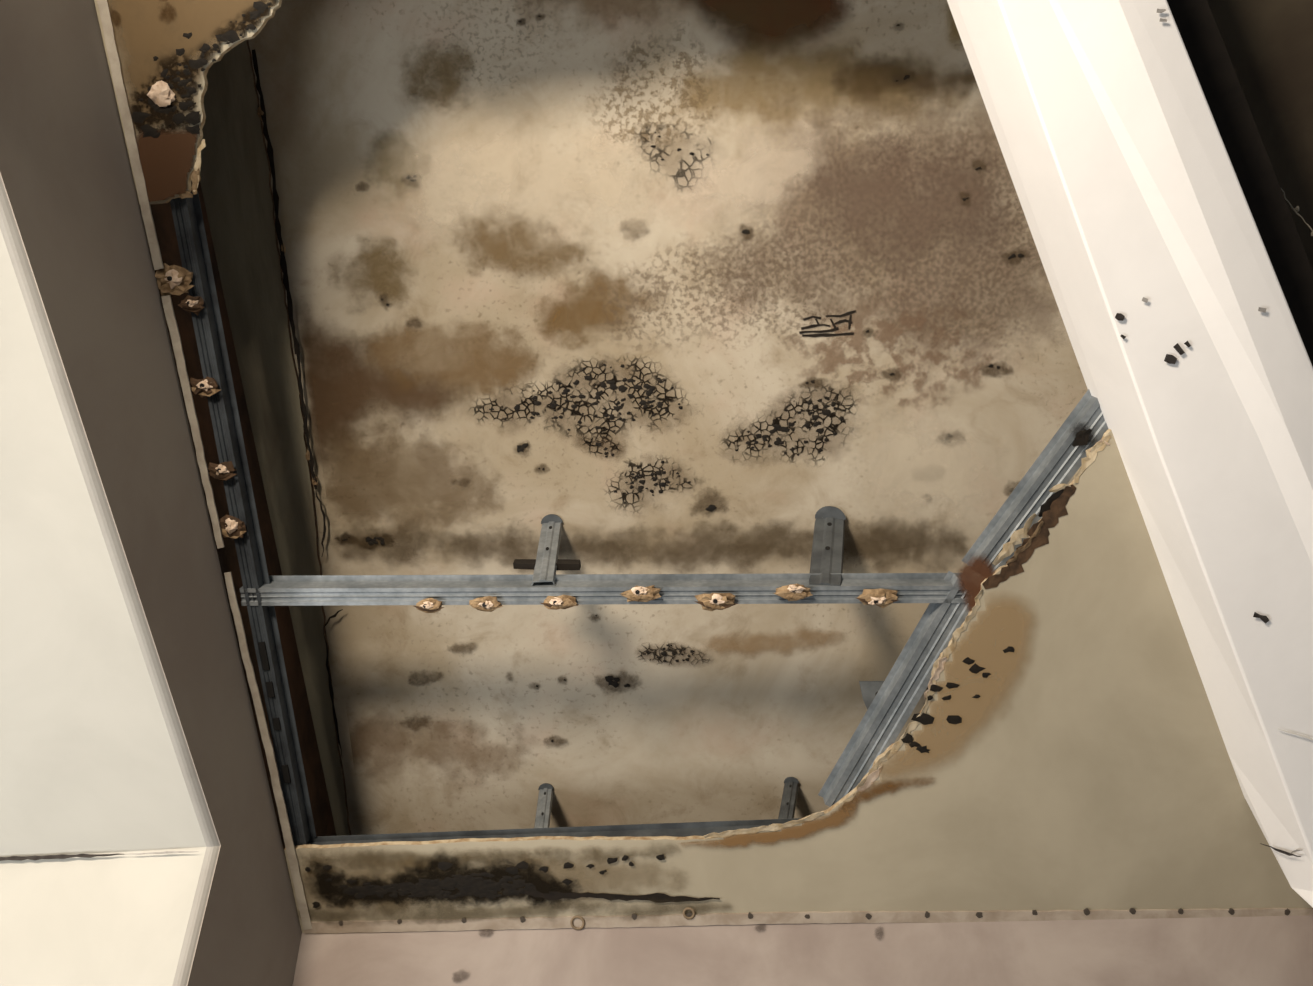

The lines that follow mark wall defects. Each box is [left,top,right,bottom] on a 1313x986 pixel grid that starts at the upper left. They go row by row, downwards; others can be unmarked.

leakage [107,0,277,138]
leakage [688,0,976,109]
leakage [302,319,691,514]
mould [725,310,1010,460]
peeling [1072,428,1110,452]
spalling [136,131,299,917]
corrosion [958,557,994,612]
peeling [993,484,1071,566]
spalling [274,606,337,836]
leakage [638,644,706,664]
leakage [687,602,1029,847]
leakage [305,851,634,922]